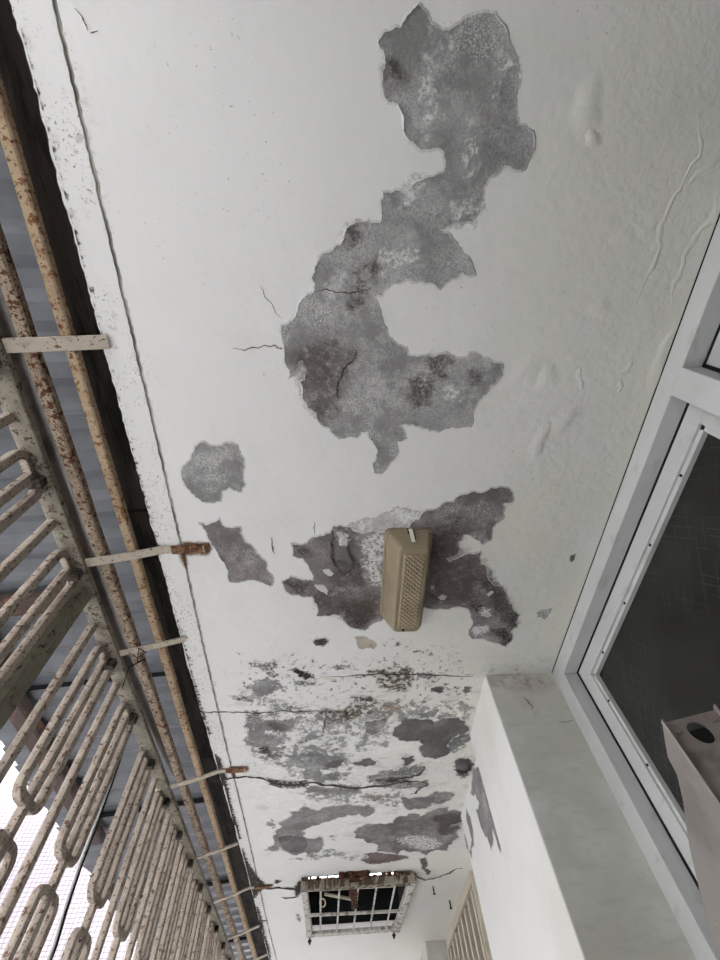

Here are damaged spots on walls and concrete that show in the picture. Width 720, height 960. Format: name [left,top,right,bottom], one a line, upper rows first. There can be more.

peeling [279,2,537,474]
crack [233,344,282,352]
peeling [180,440,246,504]
peeling [198,485,520,649]
leakage [233,642,468,722]
crack [330,671,473,679]
leakage [268,713,289,731]
crack [226,766,428,794]
peeling [264,716,502,875]